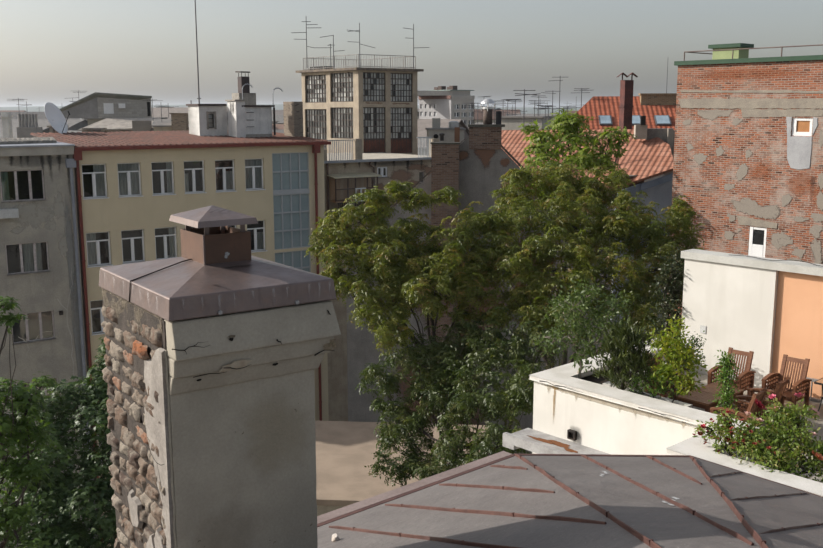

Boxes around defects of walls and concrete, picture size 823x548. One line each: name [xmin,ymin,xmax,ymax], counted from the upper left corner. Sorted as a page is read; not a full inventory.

flaking render [724,149,792,240]
flaking render [771,173,823,264]
flaking render [101,306,175,548]
corrosion [527,435,578,453]